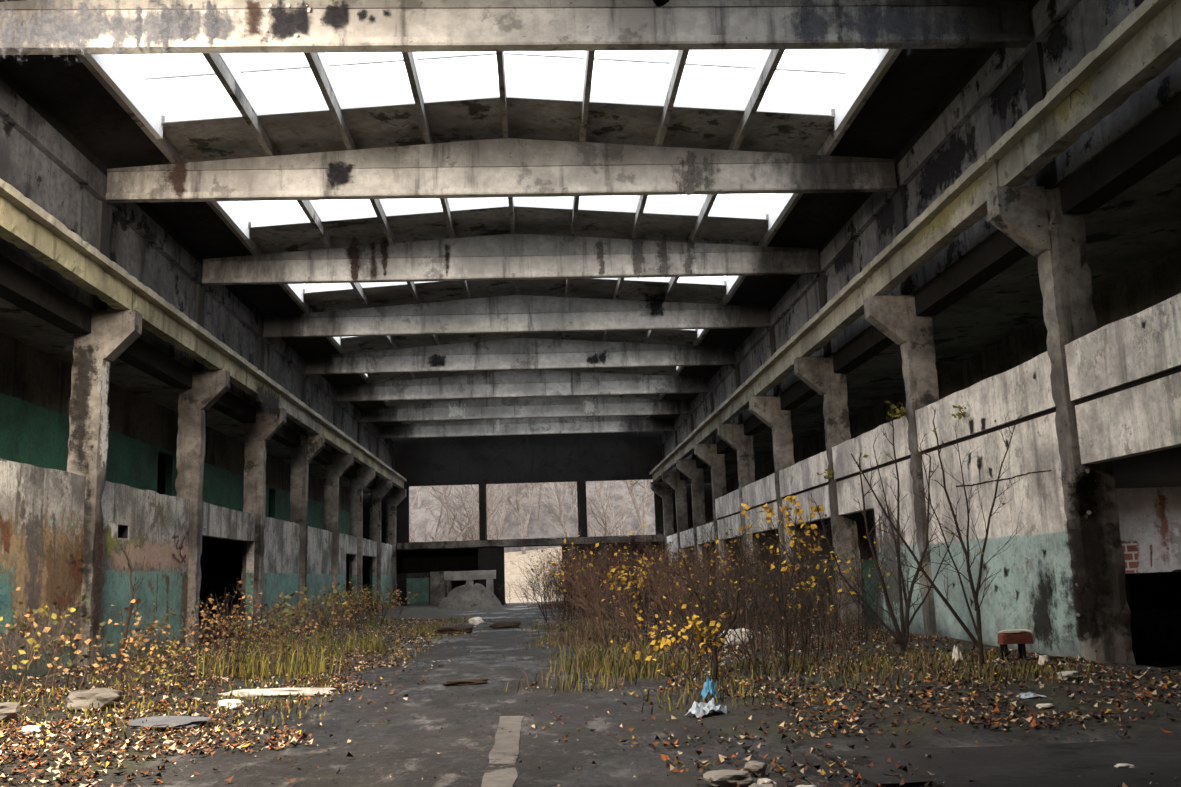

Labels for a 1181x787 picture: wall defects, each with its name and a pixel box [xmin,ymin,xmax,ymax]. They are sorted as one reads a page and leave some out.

damp [0,0,389,60]
peeling [0,506,84,674]
damp [1028,468,1113,653]
rust [1150,490,1169,572]